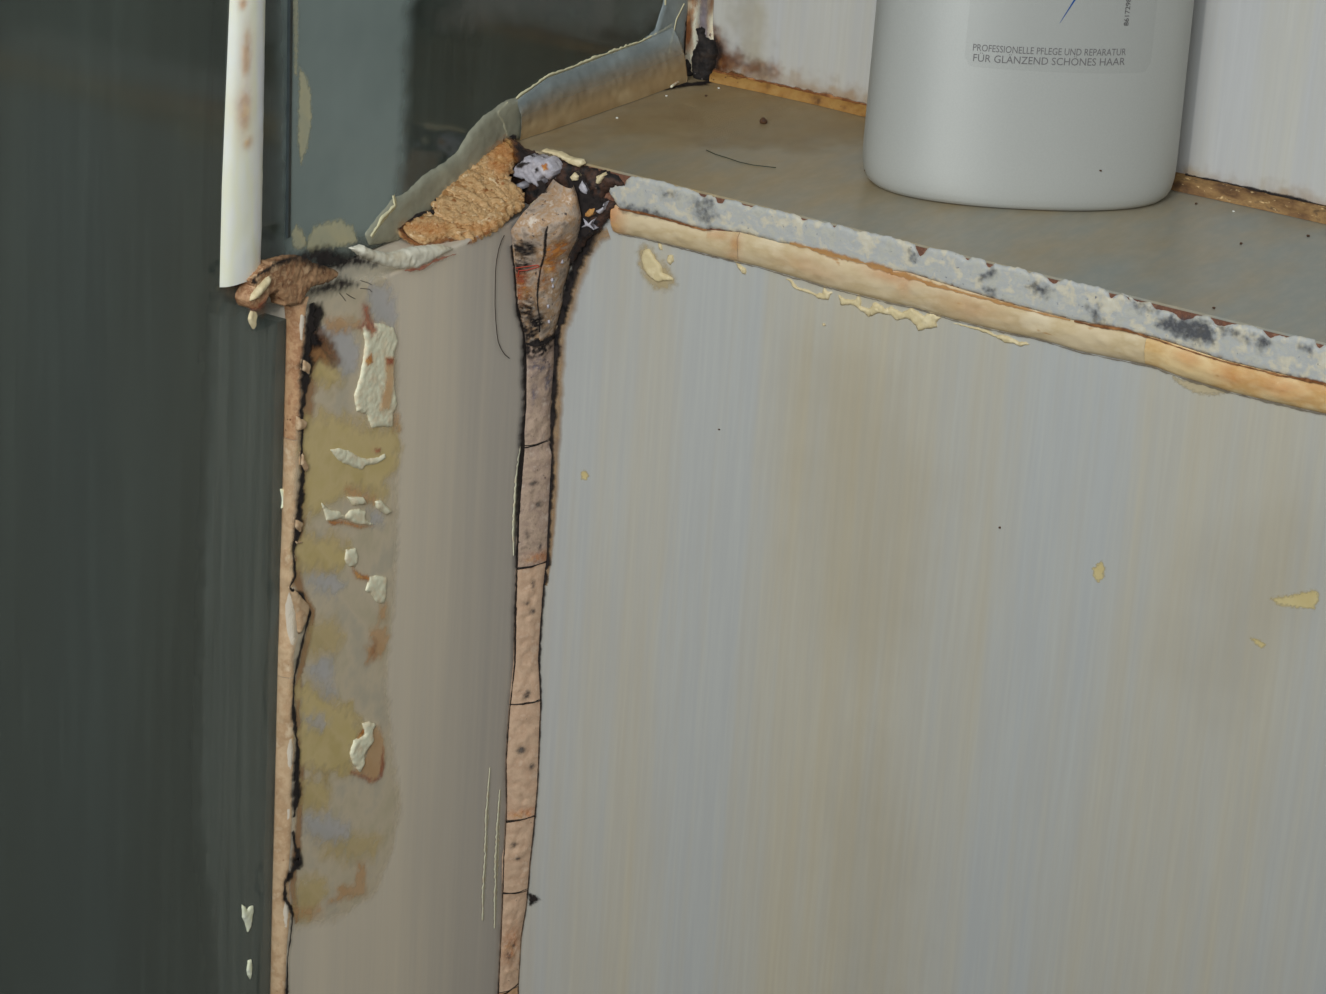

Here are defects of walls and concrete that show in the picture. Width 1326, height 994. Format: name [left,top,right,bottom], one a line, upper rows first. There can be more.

peeling [513,153,563,196]
crack [525,226,555,348]
peeling [609,176,1326,383]
peeling [354,323,398,428]
peeling [331,448,386,470]
peeling [321,496,392,527]
peeling [345,548,387,604]
peeling [288,586,309,634]
crack [283,302,317,994]
peeling [350,721,376,772]